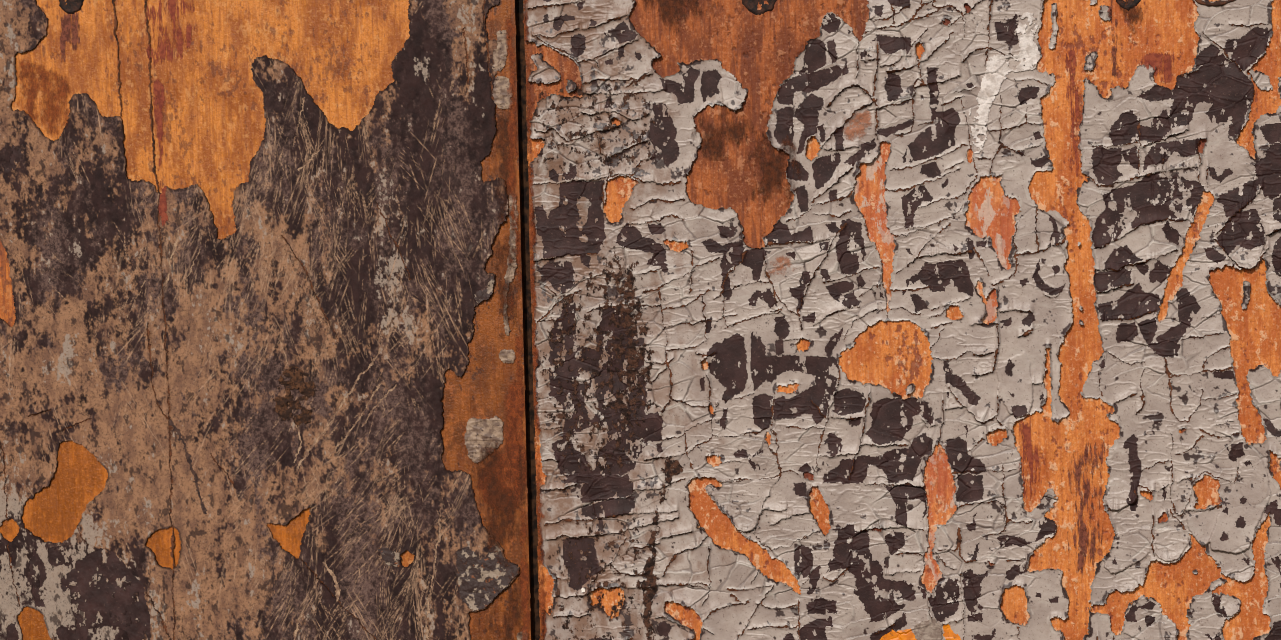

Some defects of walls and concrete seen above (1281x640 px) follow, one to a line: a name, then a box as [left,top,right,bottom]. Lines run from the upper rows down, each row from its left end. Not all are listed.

peeling [0,239,16,327]
peeling [11,0,410,239]
crack [528,0,1065,640]
peeling [441,0,1281,640]
crack [1095,218,1186,322]
crack [1090,118,1209,188]
crack [1180,23,1269,76]
crack [1213,187,1281,270]
crack [1098,312,1240,557]
spalling [0,440,151,640]